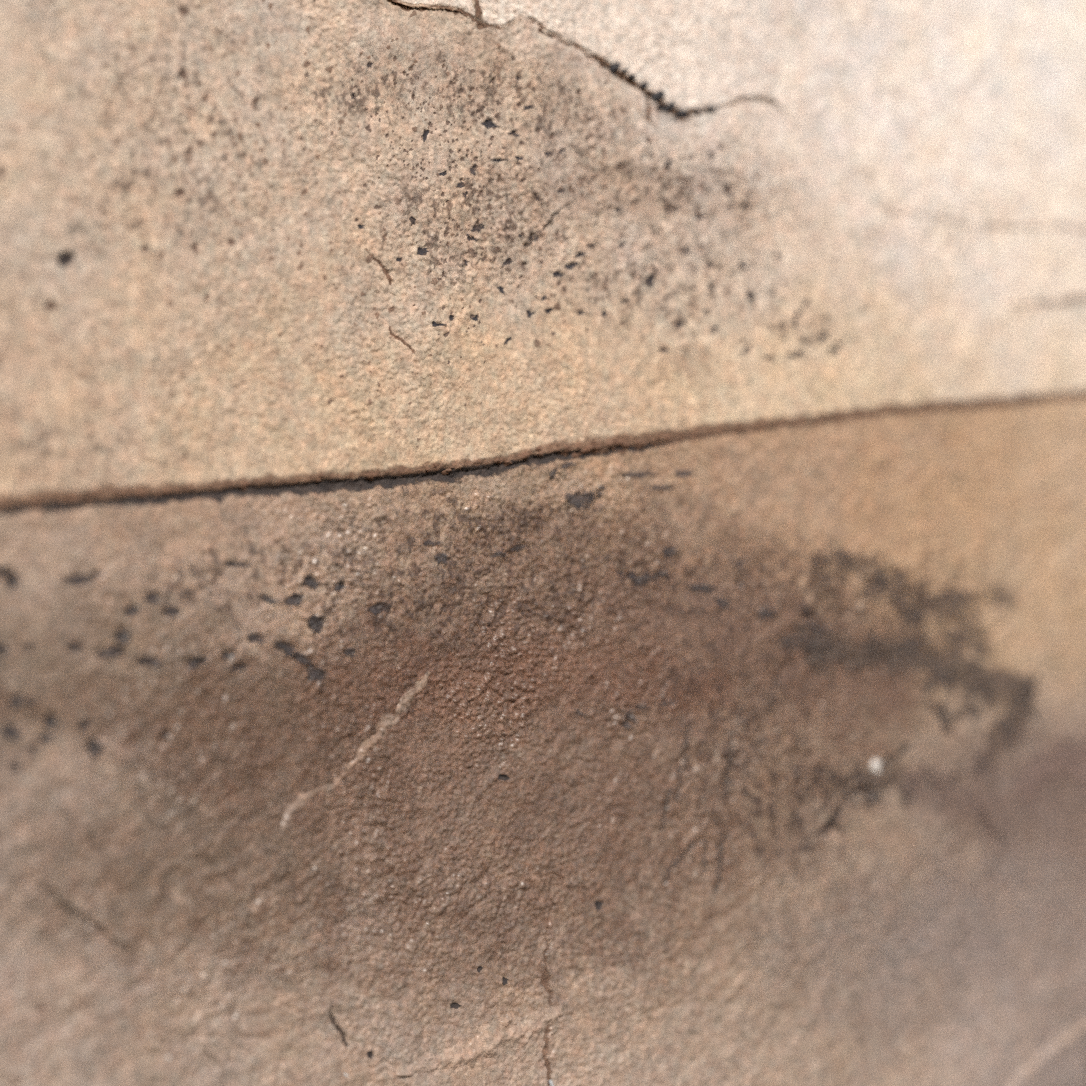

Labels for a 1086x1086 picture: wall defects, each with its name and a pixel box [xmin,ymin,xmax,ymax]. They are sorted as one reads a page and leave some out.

crack [393,0,501,29]
crack [532,20,785,126]
crack [0,389,1086,515]
damp [140,508,1086,963]
crack [329,1001,348,1048]
crack [540,899,554,1086]